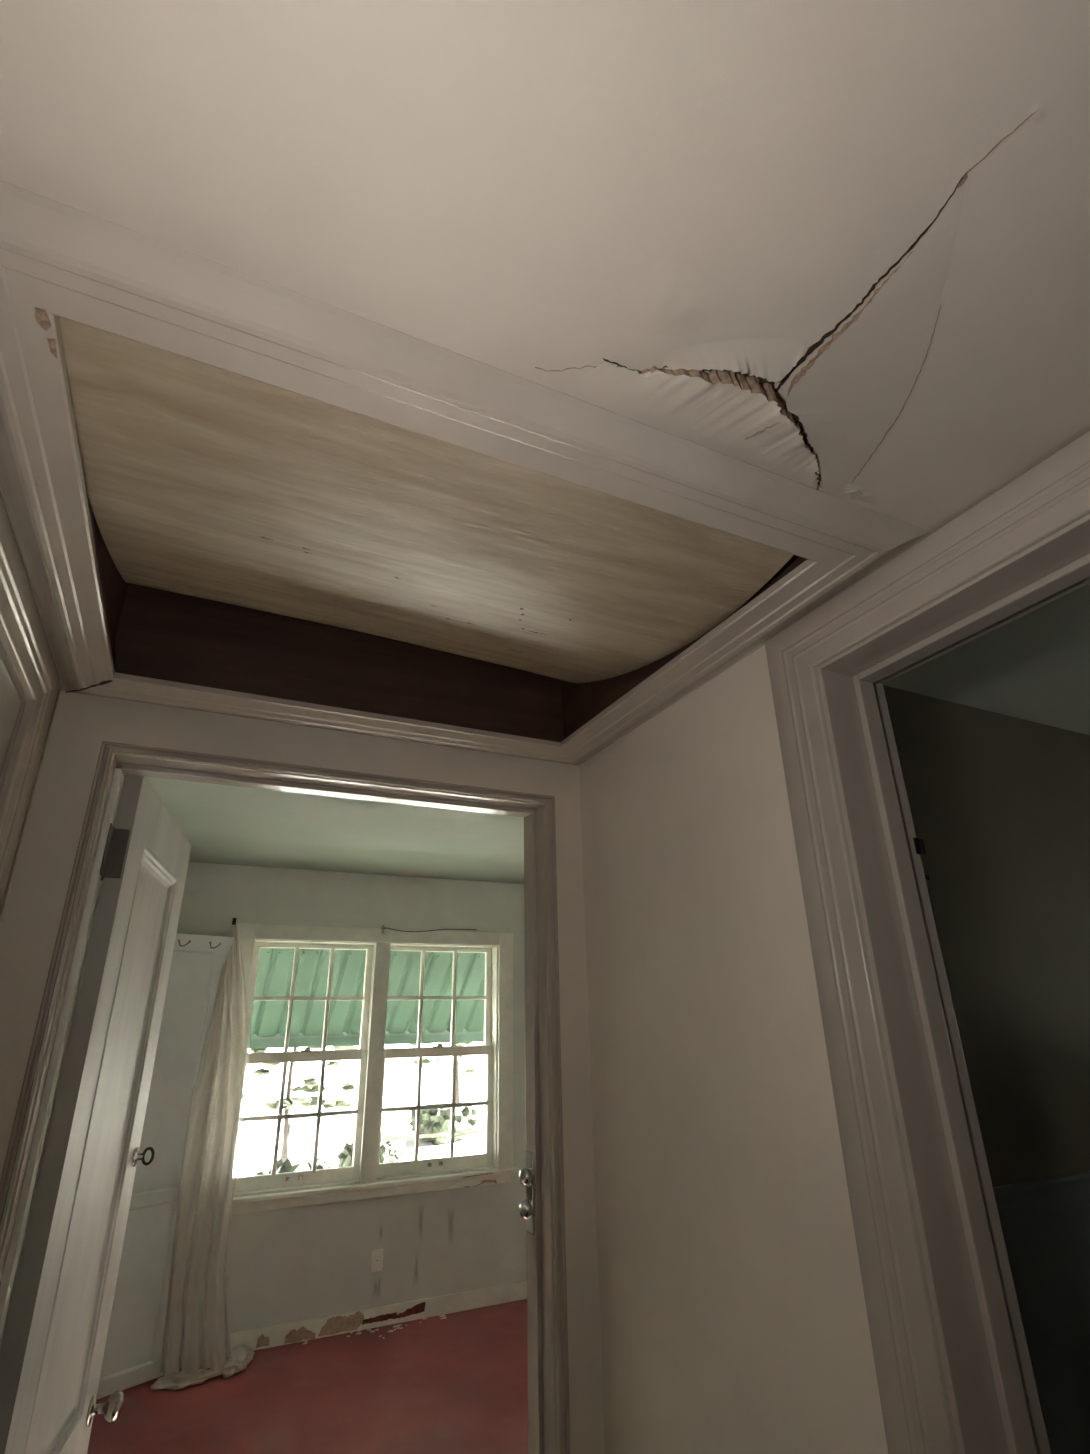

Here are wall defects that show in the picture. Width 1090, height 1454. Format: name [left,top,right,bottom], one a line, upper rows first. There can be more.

crack [702,110,1038,490]
crack [535,358,667,373]
peeling [255,1311,364,1349]